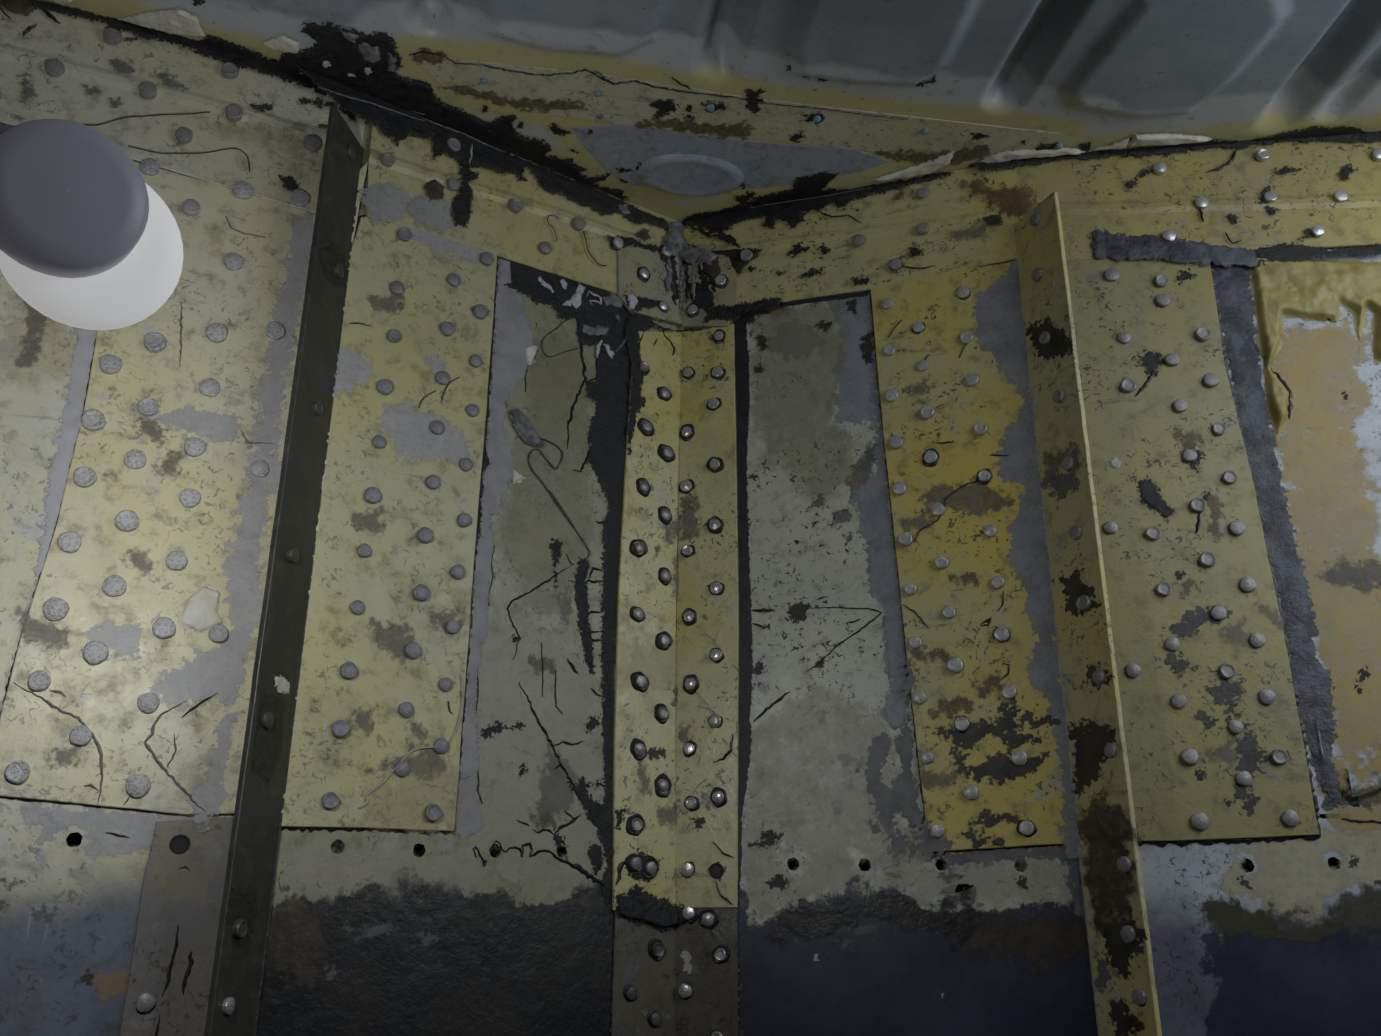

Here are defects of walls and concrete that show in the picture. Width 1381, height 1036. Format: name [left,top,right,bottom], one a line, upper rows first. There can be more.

peeling [117,0,206,43]
peeling [263,35,300,53]
spalling [649,99,726,120]
peeling [867,151,955,182]
peeling [970,131,1214,167]
spalling [1258,165,1302,215]
peeling [360,179,493,263]
spalling [775,241,831,281]
peeling [538,276,622,359]
peeling [1248,228,1381,442]
peeling [332,345,373,399]
leakage [768,891,979,952]